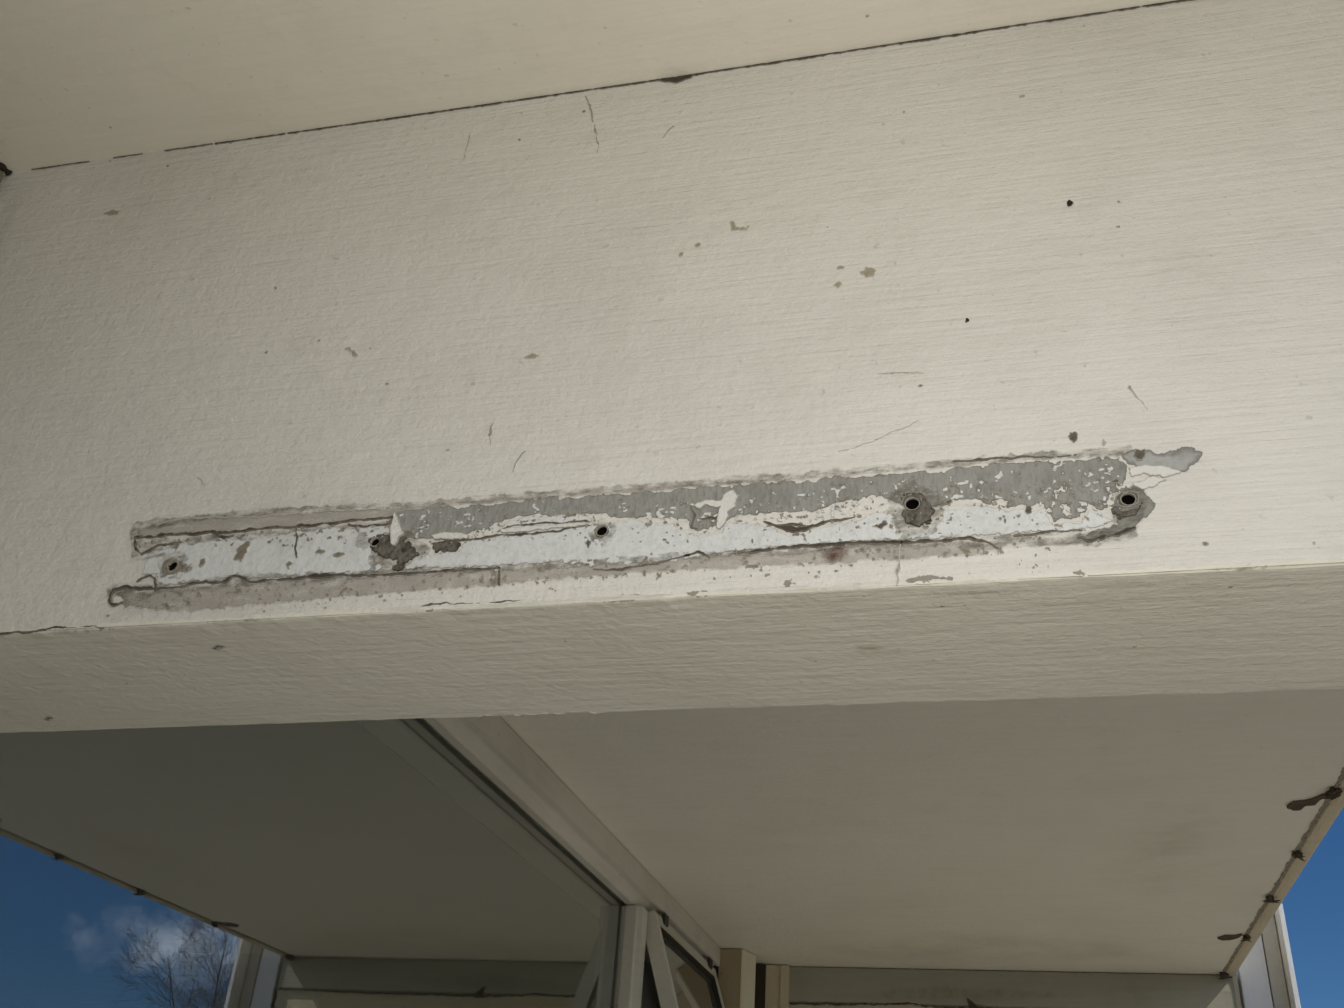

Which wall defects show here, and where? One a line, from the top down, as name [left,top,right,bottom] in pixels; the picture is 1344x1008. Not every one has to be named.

peeling [101,439,1203,630]